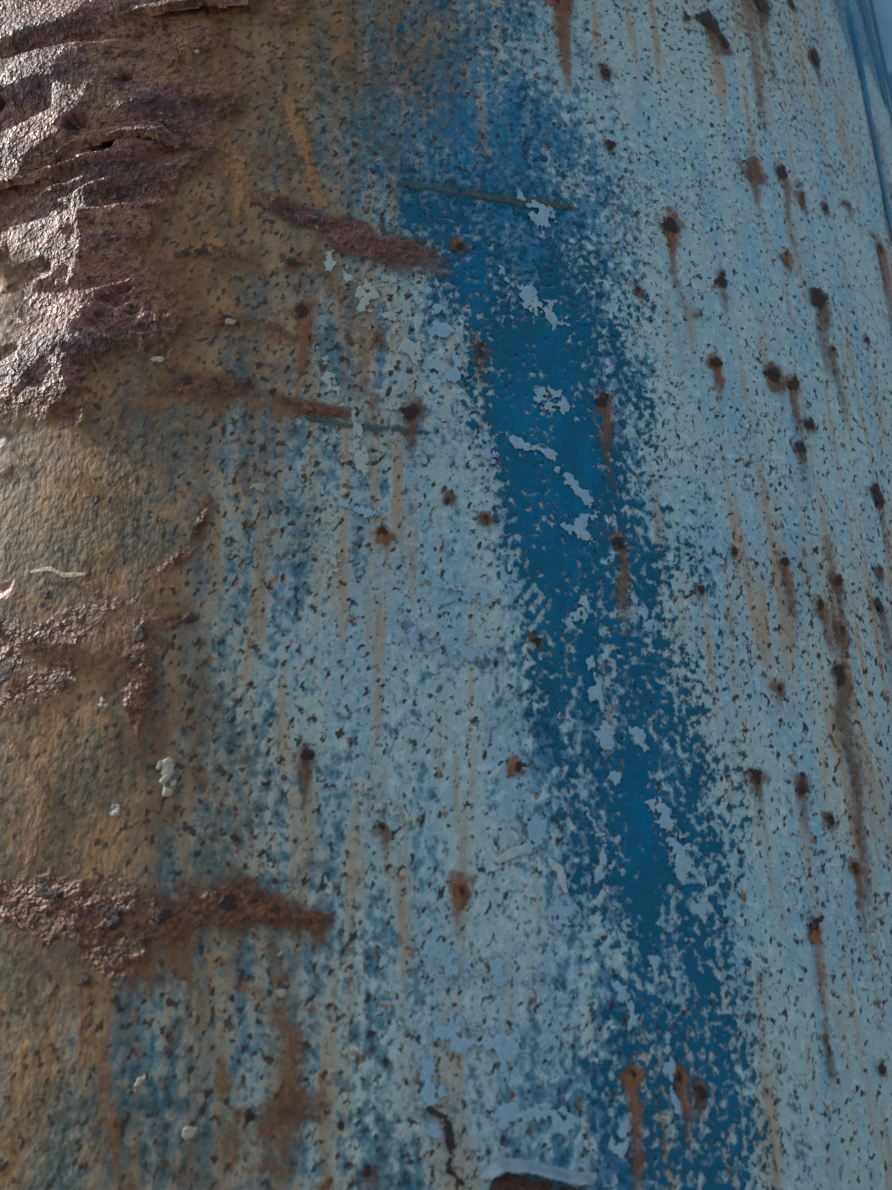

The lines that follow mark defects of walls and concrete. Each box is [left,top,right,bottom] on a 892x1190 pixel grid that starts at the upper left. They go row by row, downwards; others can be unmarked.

corrosion [545,0,573,86]
corrosion [683,8,734,55]
corrosion [0,0,449,425]
corrosion [660,206,704,317]
corrosion [738,156,808,222]
corrosion [707,352,724,393]
corrosion [766,361,818,470]
corrosion [812,286,846,404]
peeling [311,0,793,1190]
corrosion [815,537,875,930]
corrosion [0,586,330,1062]
corrosion [809,914,835,1081]